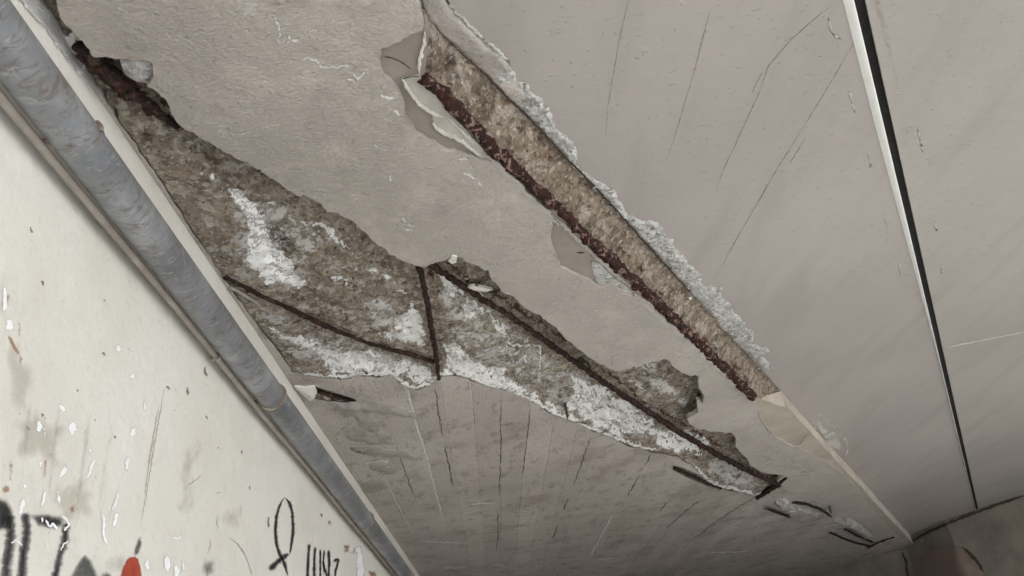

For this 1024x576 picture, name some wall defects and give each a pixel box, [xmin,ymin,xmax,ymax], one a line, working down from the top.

damp [228,188,350,291]
spalling [44,0,831,516]
corrosion [446,261,575,348]
crack [435,390,453,484]
crack [496,410,531,546]
crack [553,438,591,537]
crack [577,357,591,369]
corrosion [594,363,733,453]